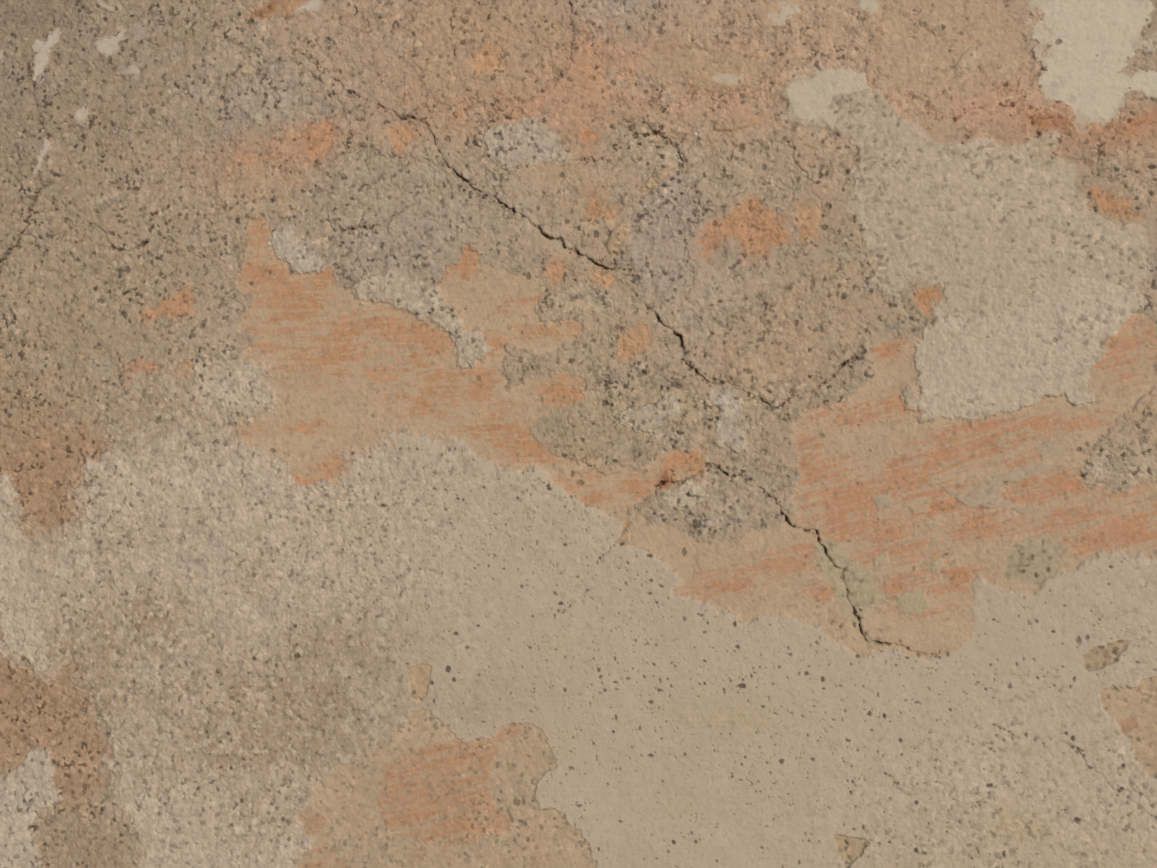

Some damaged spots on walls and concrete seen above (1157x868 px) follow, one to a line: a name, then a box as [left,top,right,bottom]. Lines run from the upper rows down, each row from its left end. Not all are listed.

crack [27,16,55,129]
crack [288,36,644,279]
crack [573,129,685,181]
crack [0,172,228,274]
peeling [235,66,1157,661]
crack [645,305,874,419]
peeling [0,417,114,537]
crack [528,463,947,659]
spalling [1084,640,1133,672]
peeling [0,662,114,868]
peeling [297,665,598,868]
peeling [1100,677,1157,778]